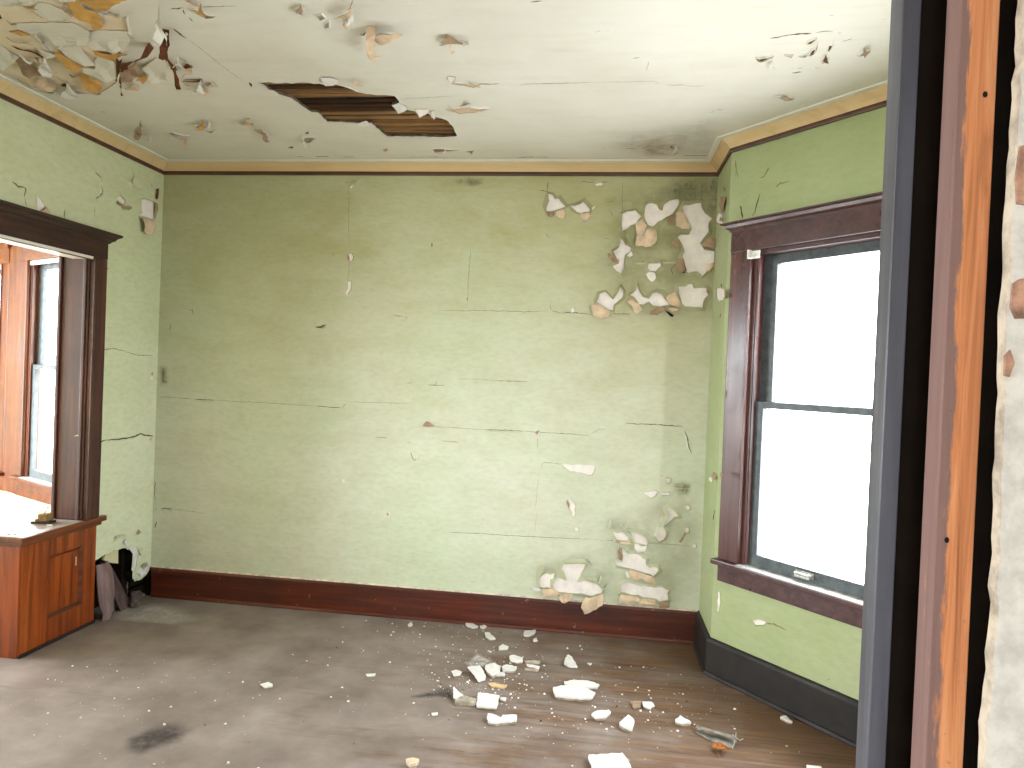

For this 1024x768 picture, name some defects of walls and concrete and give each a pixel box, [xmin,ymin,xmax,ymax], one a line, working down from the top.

peeling [0,0,217,100]
peeling [755,37,836,70]
flaking render [257,76,491,154]
peeling [97,180,159,234]
peeling [543,192,595,221]
crack [738,195,760,220]
peeling [592,187,726,319]
crack [102,433,153,443]
crack [432,426,599,467]
crack [628,423,692,454]
spalling [94,529,151,608]
peeling [532,475,697,614]